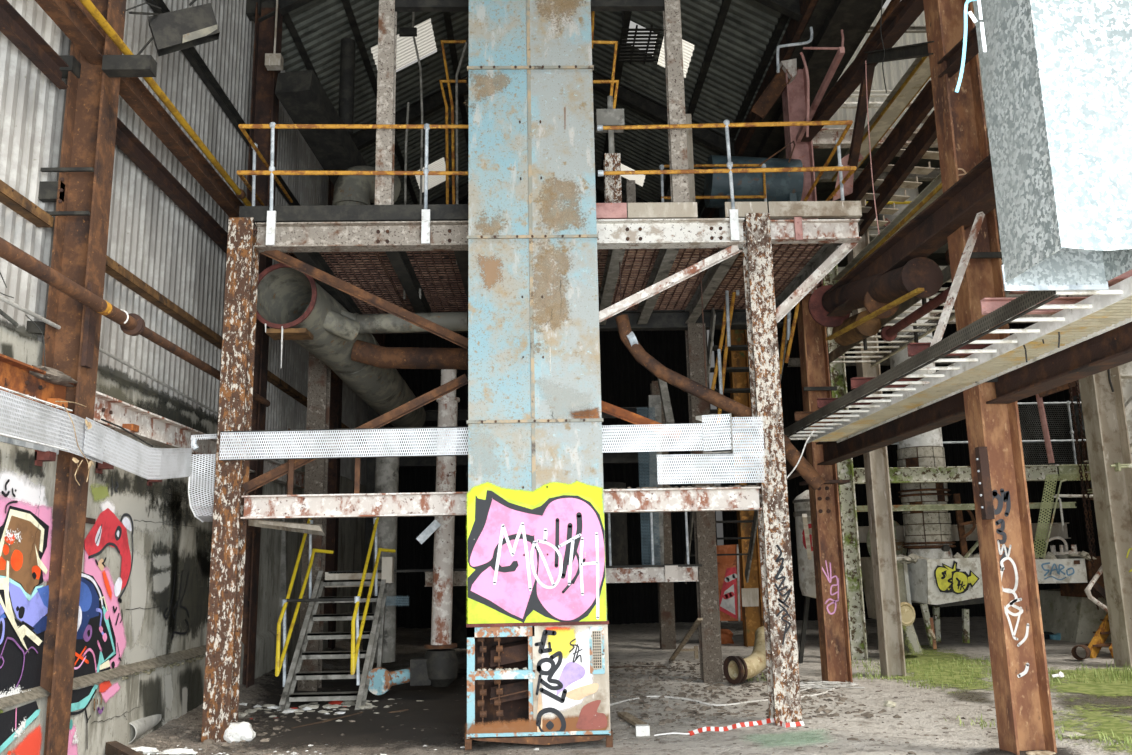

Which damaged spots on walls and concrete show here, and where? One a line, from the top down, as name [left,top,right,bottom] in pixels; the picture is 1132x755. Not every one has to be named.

peeling [535,0,586,32]
peeling [470,69,510,111]
peeling [476,211,506,235]
peeling [530,177,585,353]
leakage [98,470,212,664]
rust [467,715,608,734]